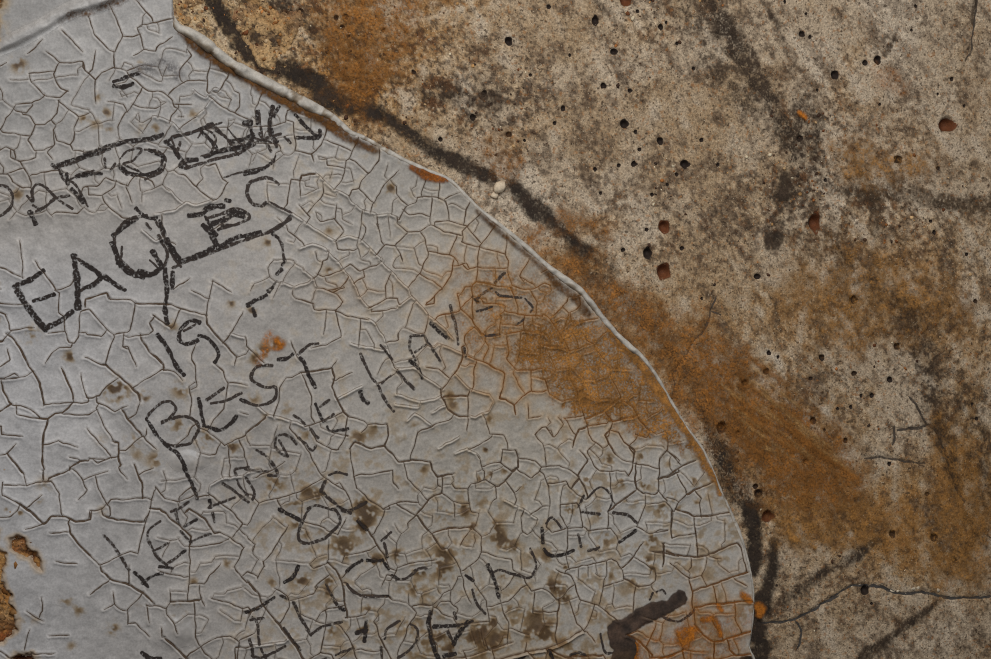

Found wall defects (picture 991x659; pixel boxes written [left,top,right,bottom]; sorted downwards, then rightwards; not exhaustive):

corrosion [313,0,419,101]
damp [204,0,612,290]
damp [477,210,591,316]
peeling [0,0,755,659]
corrosion [463,248,991,583]
damp [695,401,879,659]
corrosion [676,604,723,648]
corrosion [740,592,766,618]
crack [762,584,991,651]
damp [856,603,935,659]